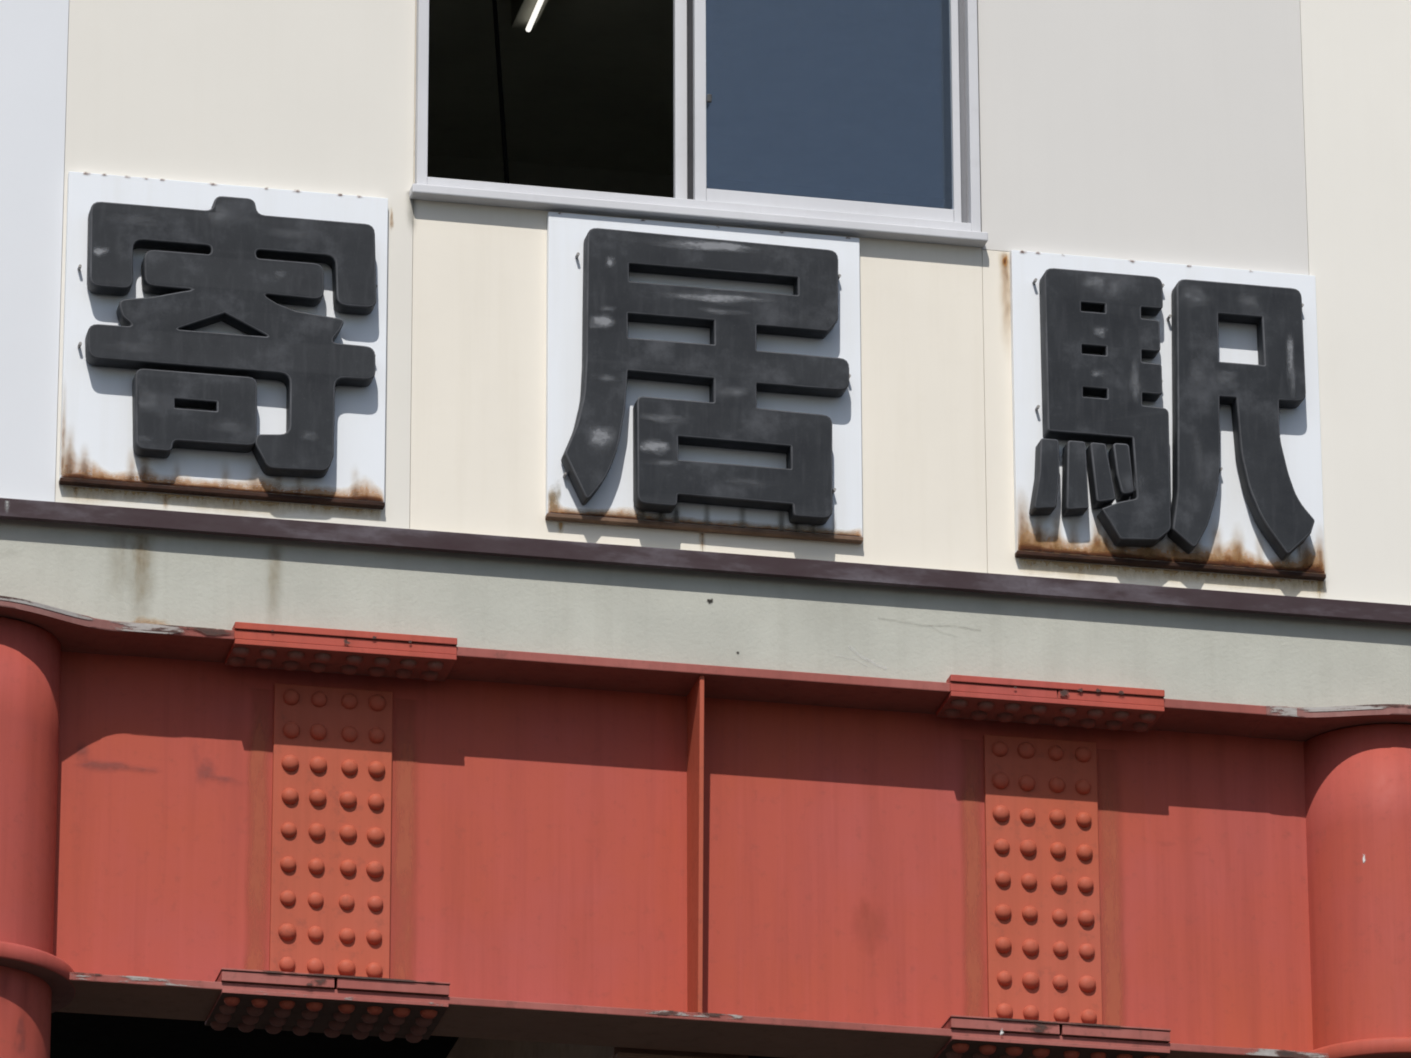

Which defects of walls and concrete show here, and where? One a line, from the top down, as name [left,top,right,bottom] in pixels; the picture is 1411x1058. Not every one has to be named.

rust [61,457,384,502]
rust [549,492,862,537]
rust [1018,516,1325,589]